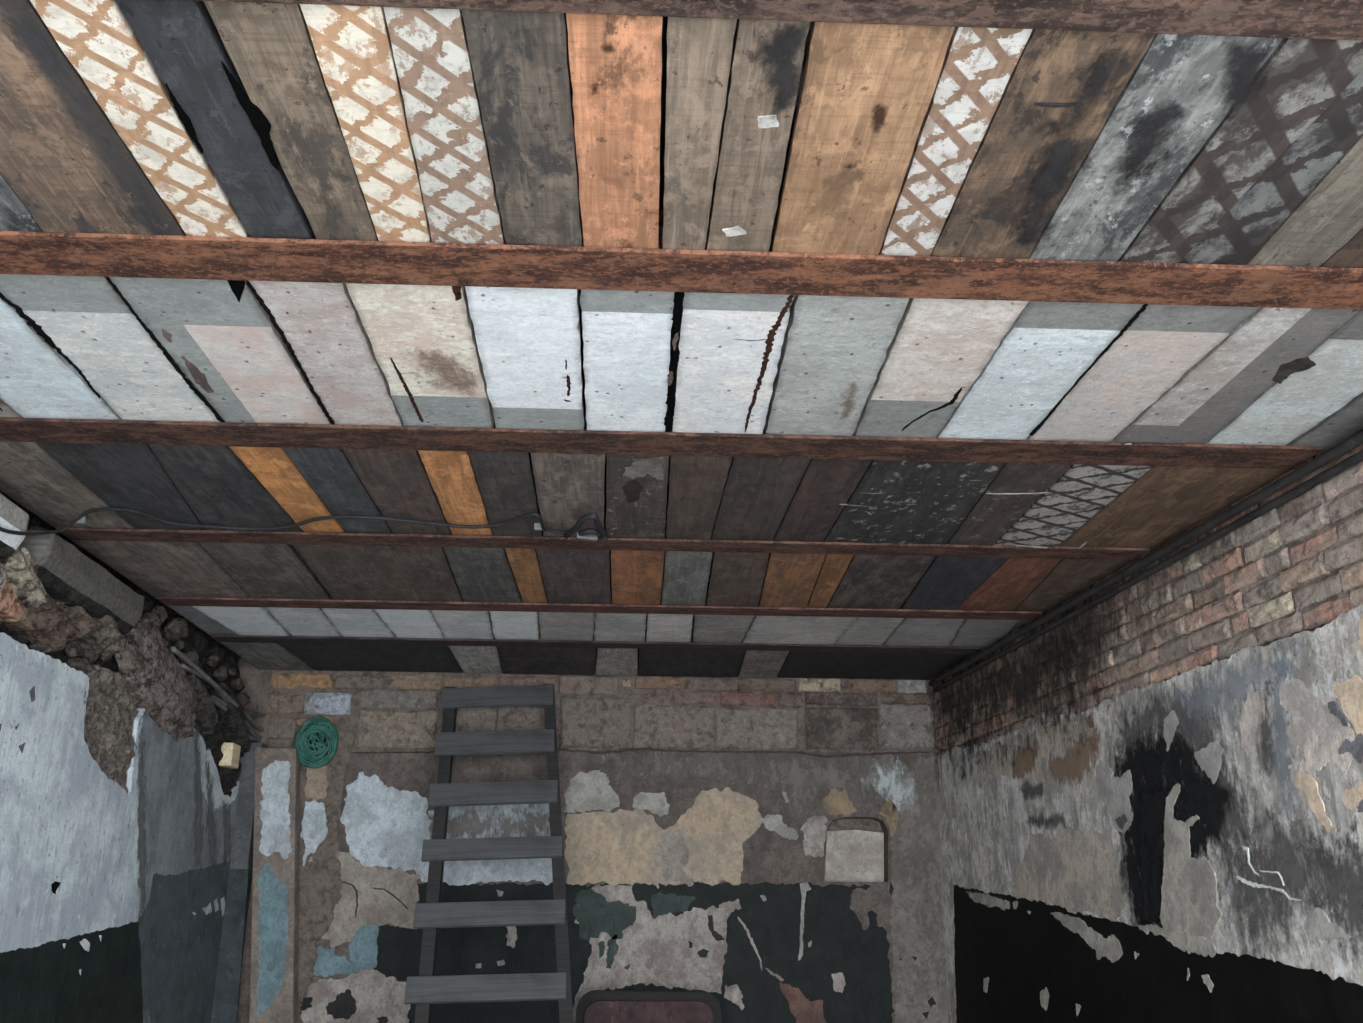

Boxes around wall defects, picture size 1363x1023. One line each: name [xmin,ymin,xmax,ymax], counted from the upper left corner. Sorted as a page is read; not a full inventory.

crack [221,61,279,171]
crack [736,295,794,433]
crack [1029,304,1148,436]
spalling [1272,357,1316,384]
flaking render [78,664,139,794]
flaking render [194,717,242,798]
peeling [63,935,102,952]
peeling [300,851,420,1023]
peeling [497,926,517,966]
peeling [564,787,857,1023]
peeling [1040,987,1049,1010]
peeling [1138,783,1222,993]